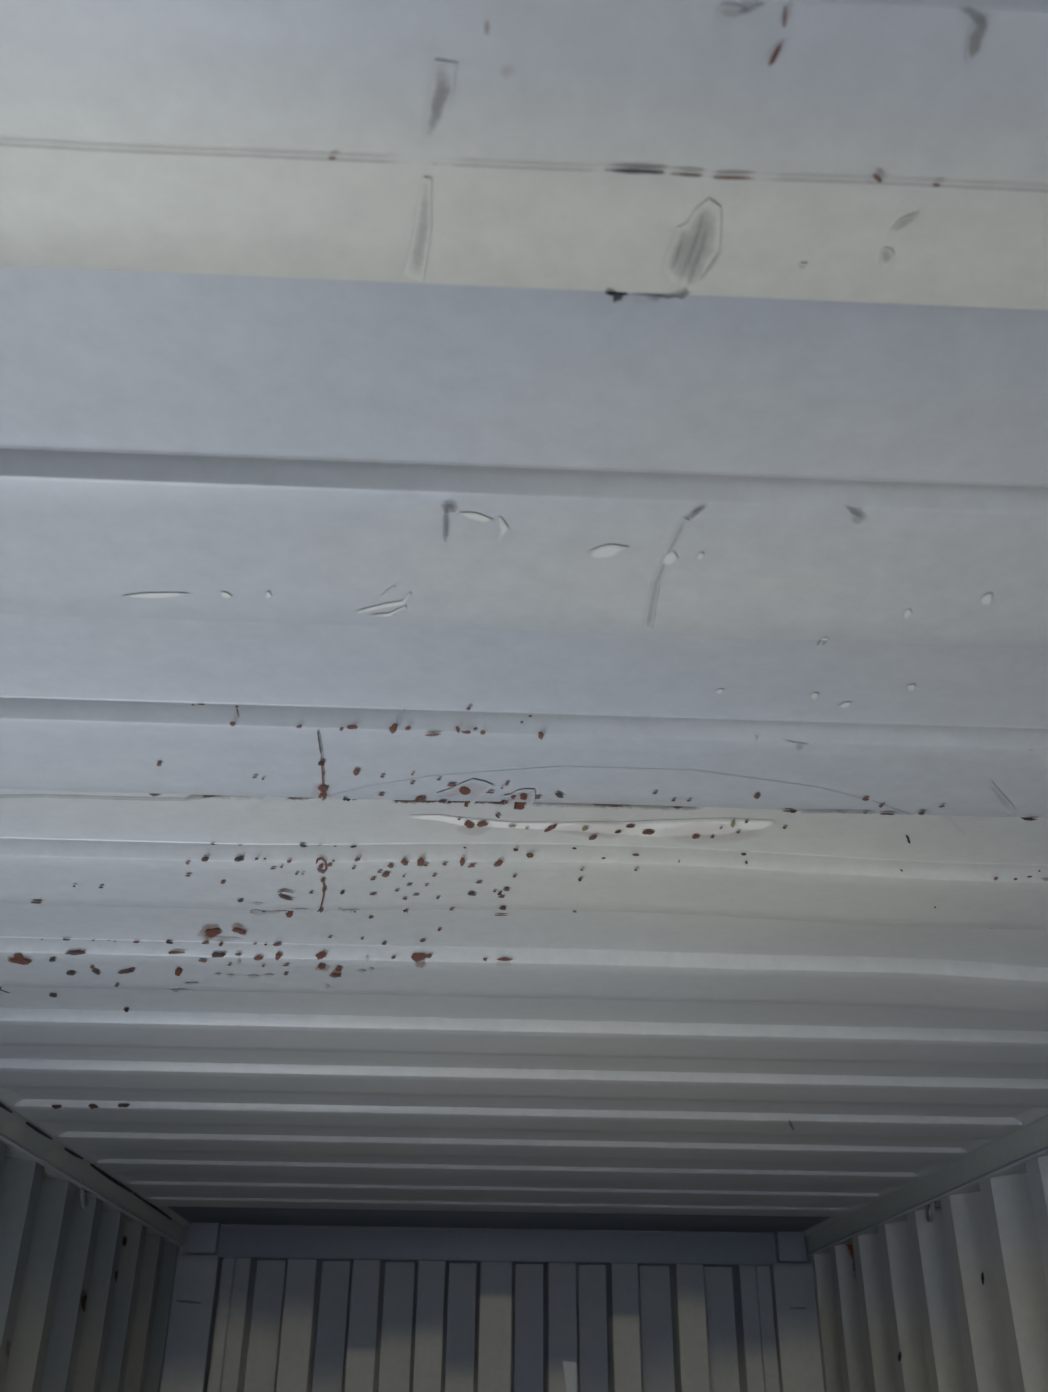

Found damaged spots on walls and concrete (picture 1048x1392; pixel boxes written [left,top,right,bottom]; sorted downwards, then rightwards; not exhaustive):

rust [389,723,485,736]
rust [296,724,328,800]
rust [410,773,563,818]
rust [234,844,373,919]
rust [370,847,534,916]
rust [8,954,31,965]
rust [49,939,116,976]
rust [166,929,289,992]
rust [315,936,373,989]
rust [381,928,441,962]